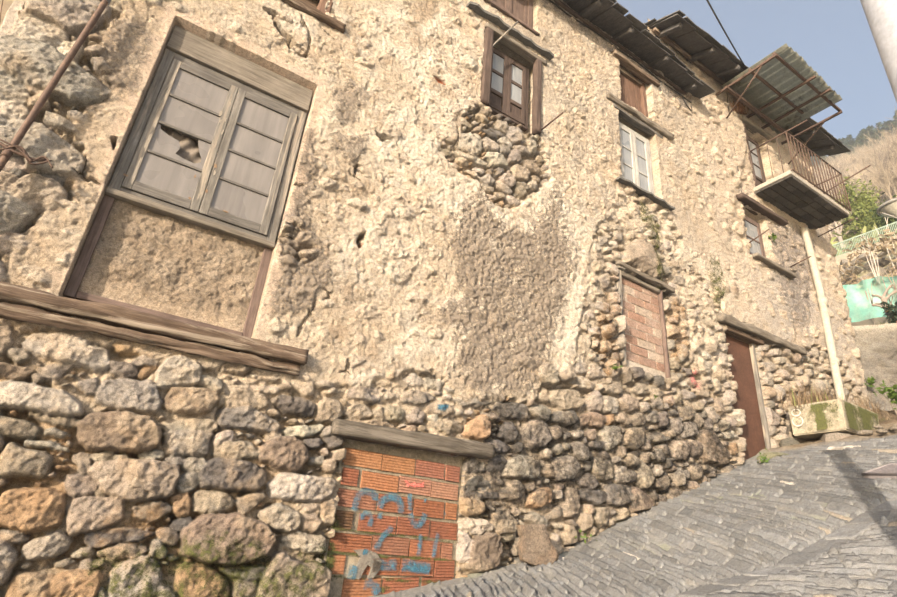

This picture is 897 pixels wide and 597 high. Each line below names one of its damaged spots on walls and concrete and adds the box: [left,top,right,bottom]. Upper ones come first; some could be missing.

flaking render [439,103,550,210]
flaking render [577,190,681,372]